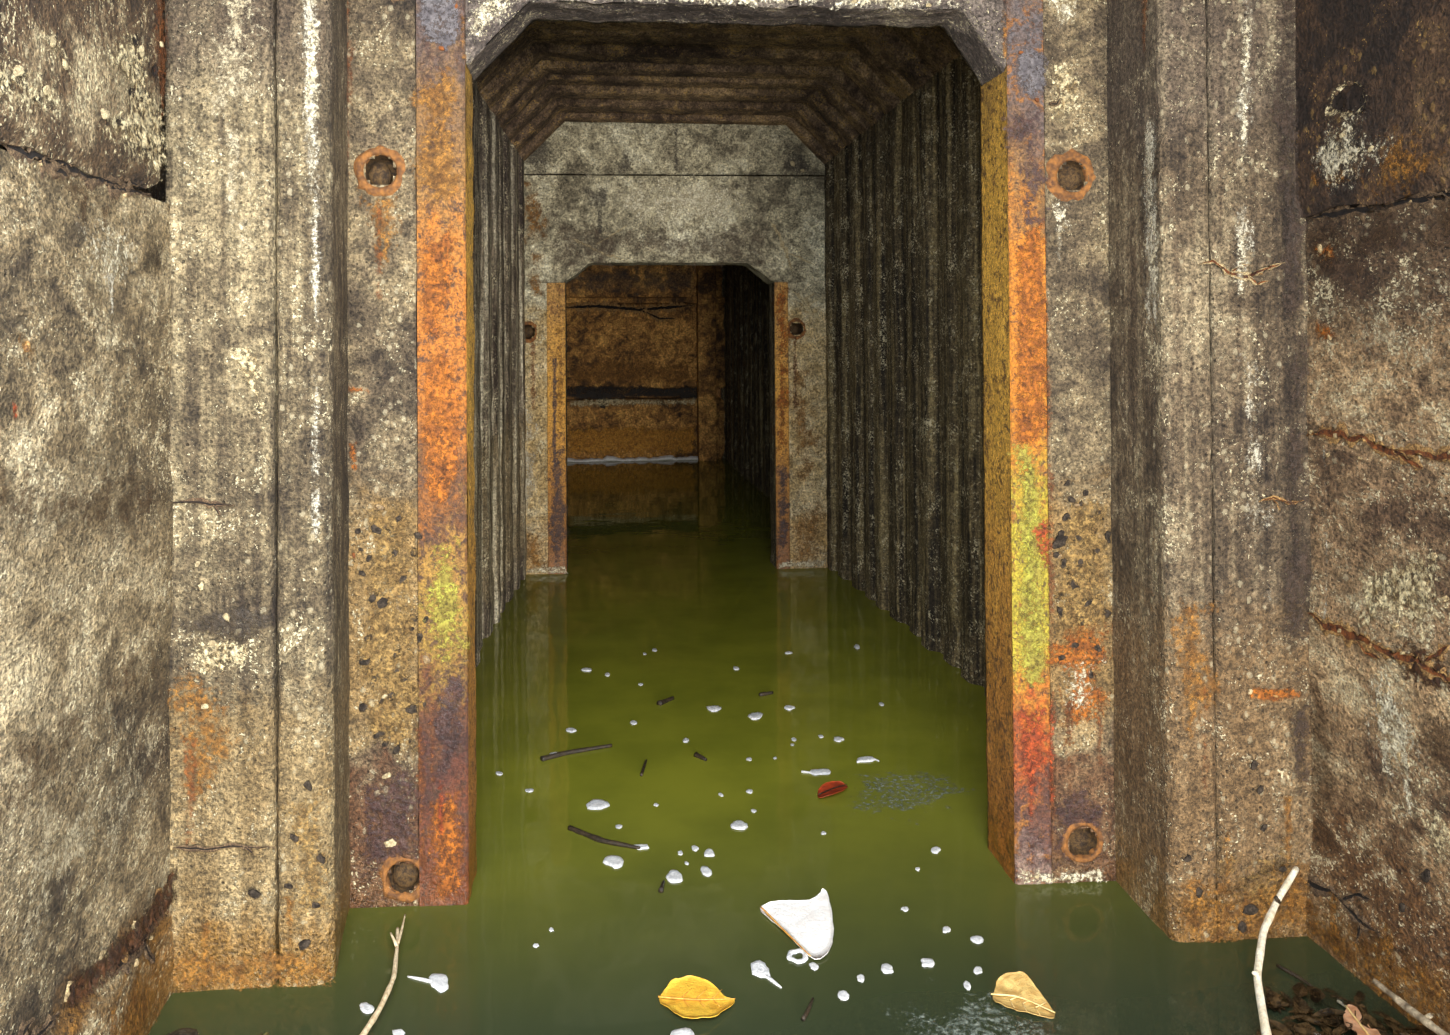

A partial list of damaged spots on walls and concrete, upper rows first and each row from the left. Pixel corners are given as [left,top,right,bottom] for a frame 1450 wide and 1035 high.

rust [412,57,464,209]
crack [0,142,153,202]
rust [360,195,401,270]
crack [1307,187,1450,224]
rust [421,227,463,504]
crack [1306,421,1450,470]
rust [1003,111,1113,871]
crack [1308,612,1450,683]
rust [168,668,243,841]
rust [357,536,470,904]
crack [110,900,172,977]
crack [0,1011,61,1035]